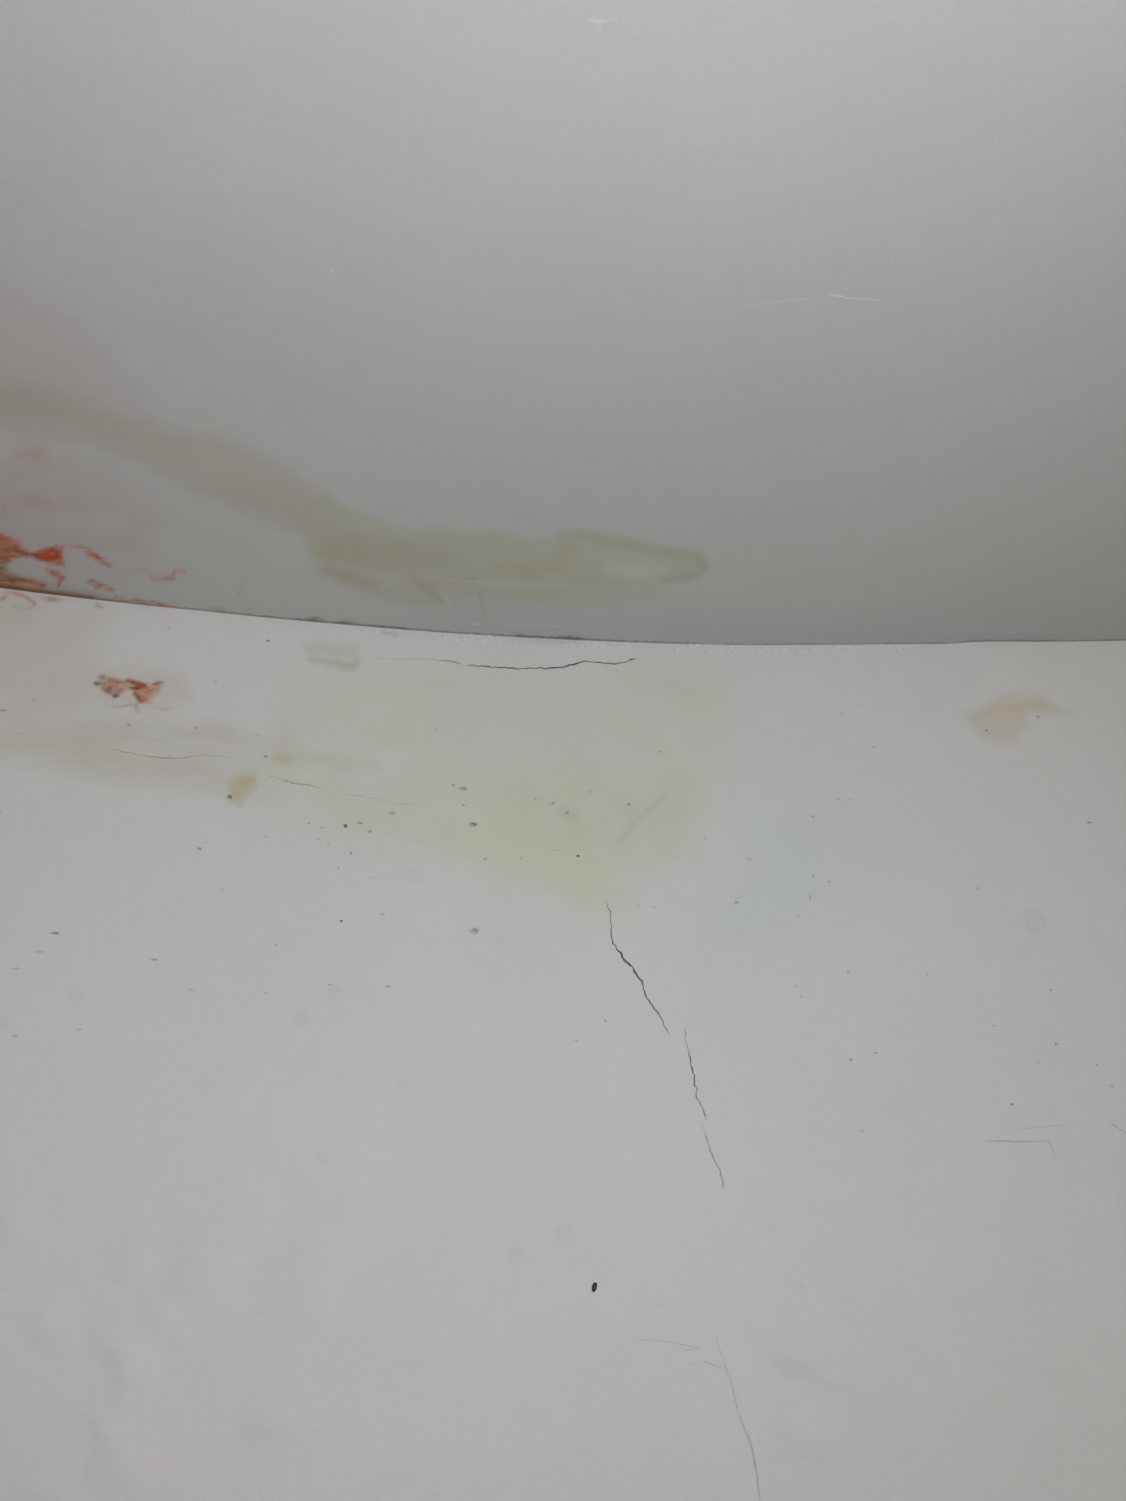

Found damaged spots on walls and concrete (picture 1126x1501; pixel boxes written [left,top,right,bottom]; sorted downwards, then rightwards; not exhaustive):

rust [0,423,189,616]
rust [80,657,203,722]
water stain [0,248,763,946]
crack [0,586,1126,673]
crack [602,898,728,1195]